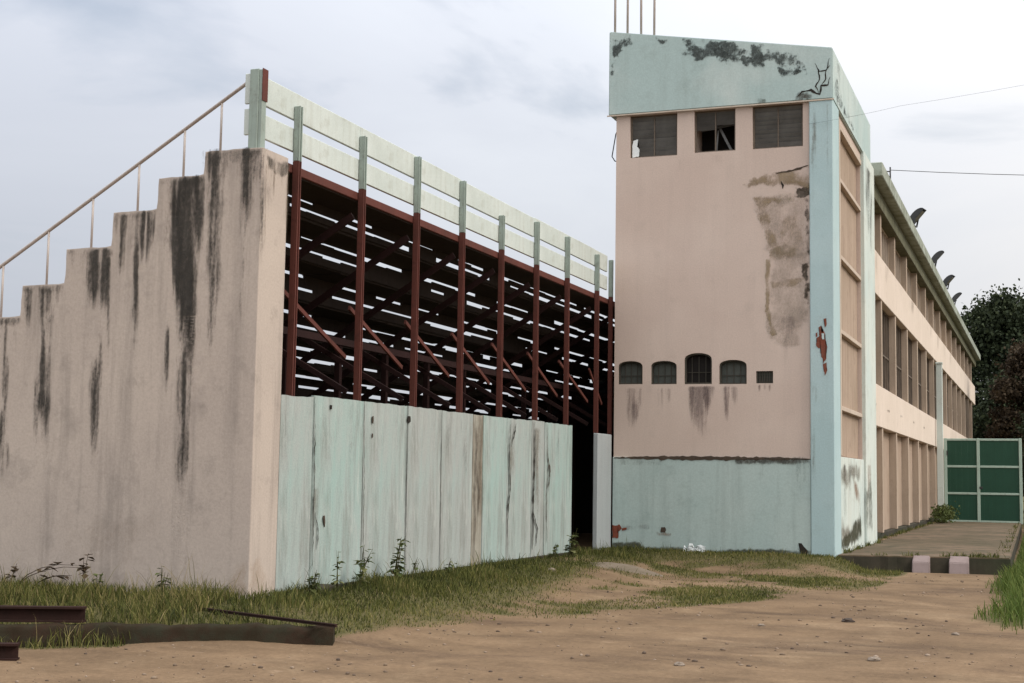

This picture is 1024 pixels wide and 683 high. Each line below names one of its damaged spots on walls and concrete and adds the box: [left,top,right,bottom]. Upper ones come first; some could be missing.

crack [797,60,830,99]
water stain [242,147,289,210]
water stain [26,289,51,421]
water stain [91,354,101,439]
water stain [88,211,154,323]
water stain [165,149,220,474]
peeling [750,165,810,342]
peeling [816,318,827,374]